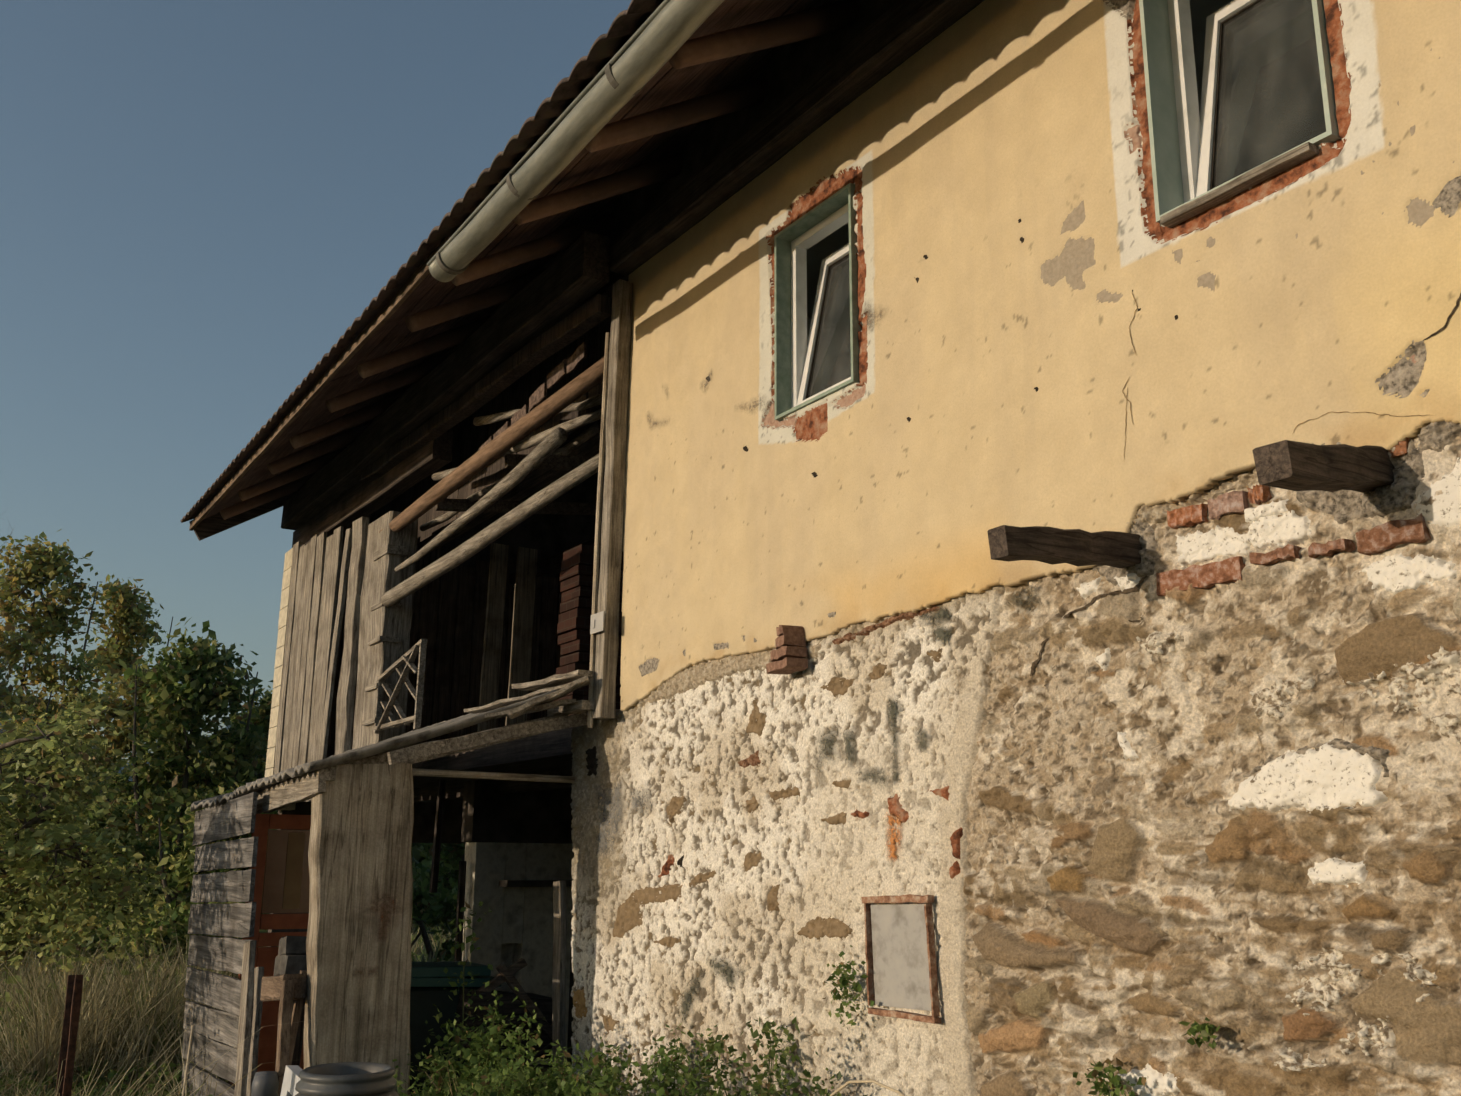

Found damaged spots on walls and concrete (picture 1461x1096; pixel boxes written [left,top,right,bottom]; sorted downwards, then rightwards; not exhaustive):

spalling [1404,161,1461,228]
peeling [1041,200,1133,303]
crack [1423,293,1461,341]
spalling [1375,340,1430,399]
spalling [761,380,867,442]
flaking render [1076,421,1461,599]
peeling [1343,645,1461,745]
peeling [1228,739,1388,813]
spalling [949,827,963,879]
peeling [1307,857,1369,888]
peeling [1274,947,1440,1072]
peeling [1117,1063,1181,1096]